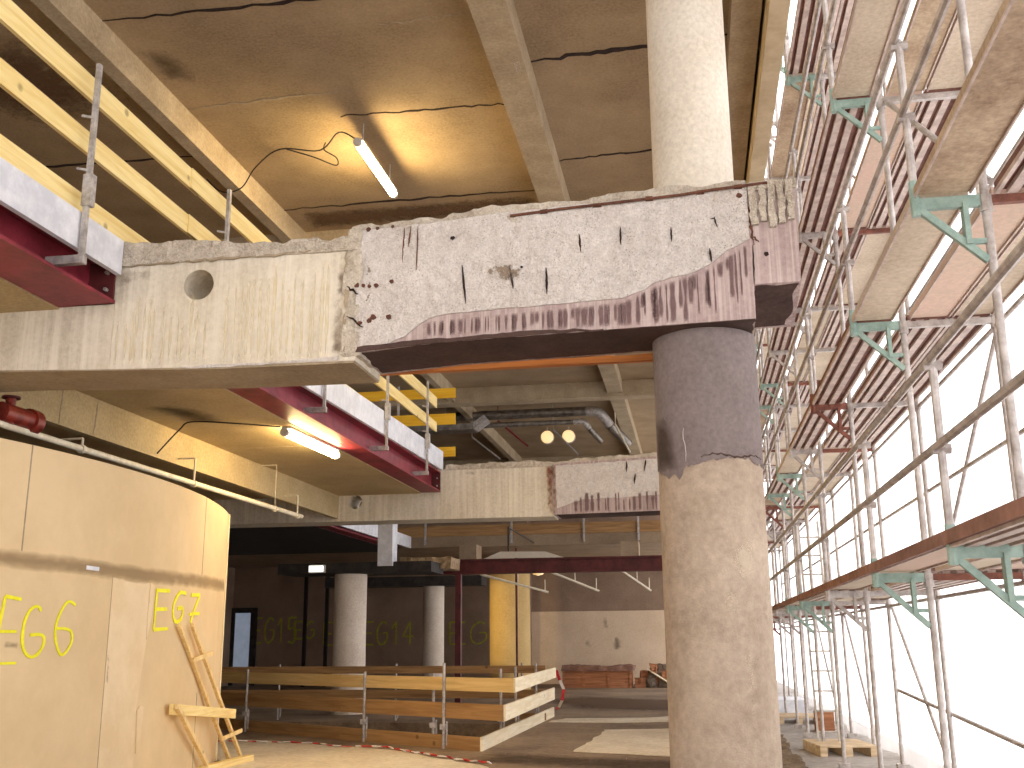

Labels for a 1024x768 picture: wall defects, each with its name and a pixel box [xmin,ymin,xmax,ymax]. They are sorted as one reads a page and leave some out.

crack [102,0,318,21]
crack [531,45,648,63]
crack [341,103,504,117]
crack [559,149,652,162]
crack [284,190,535,211]
spalling [173,180,750,369]
spalling [754,283,799,328]
spalling [555,452,659,508]
water stain [0,556,224,589]